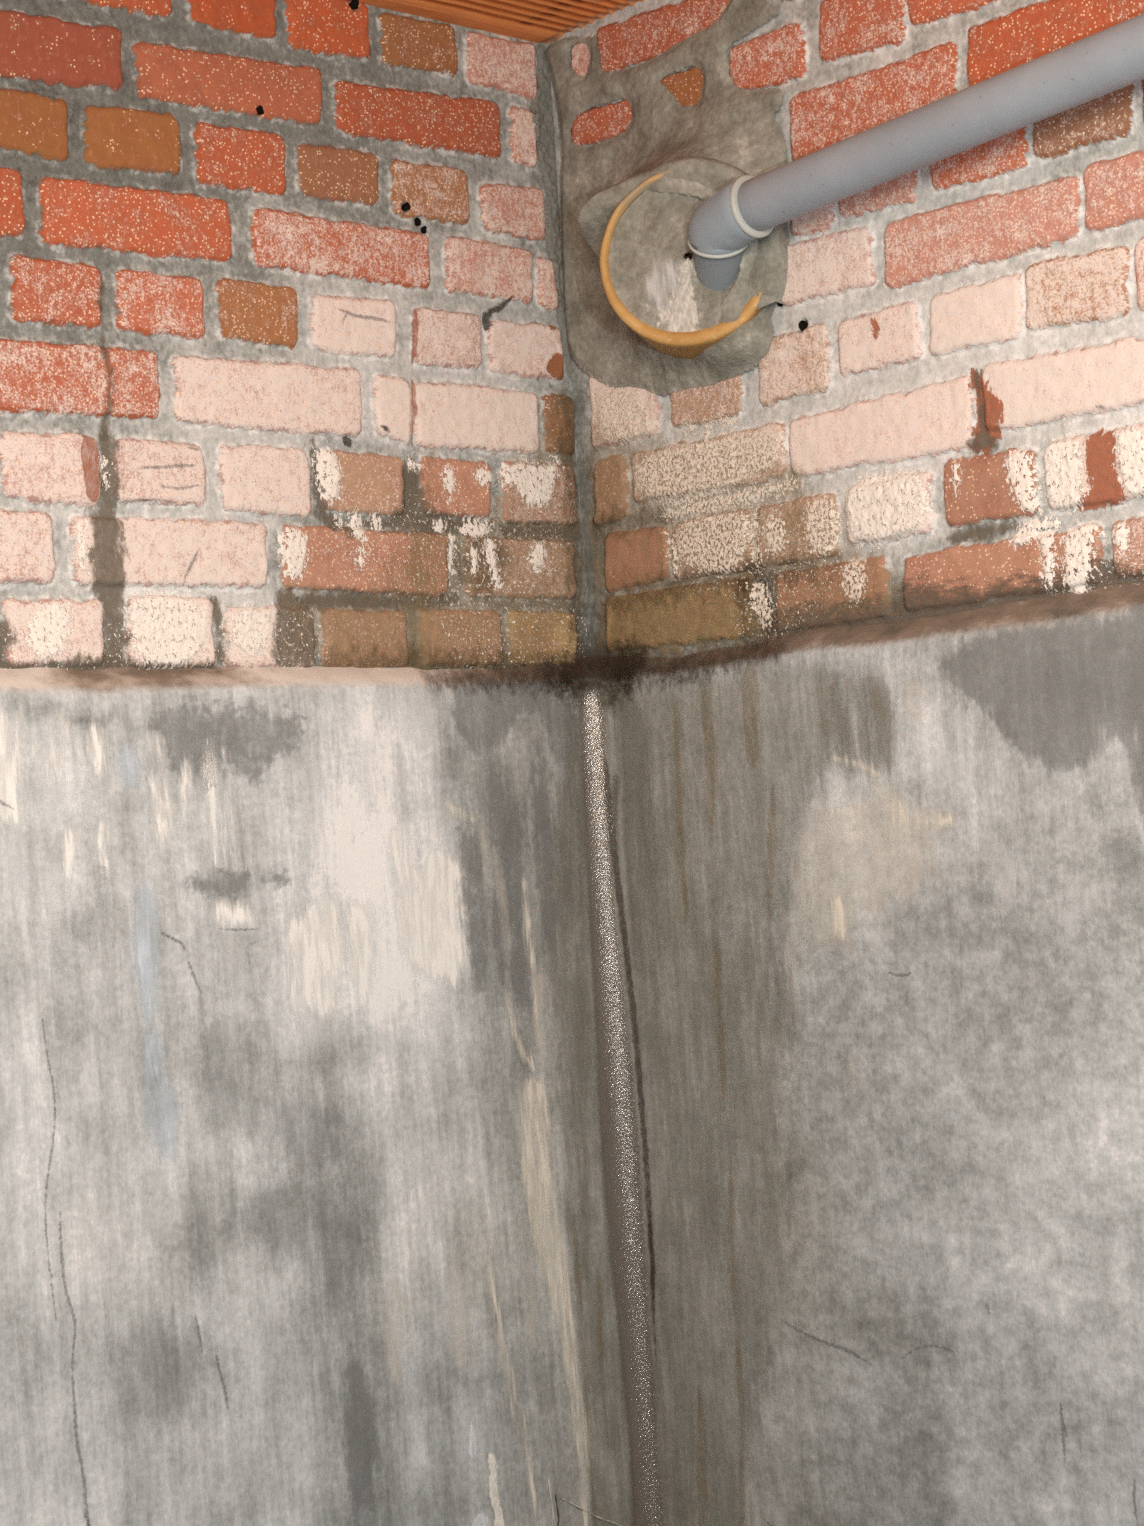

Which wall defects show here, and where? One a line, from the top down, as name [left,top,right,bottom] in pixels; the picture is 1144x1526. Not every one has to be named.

water stain [0,280,1144,1470]
peeling [469,1423,505,1526]
water stain [526,1448,536,1513]
water stain [580,1487,588,1526]